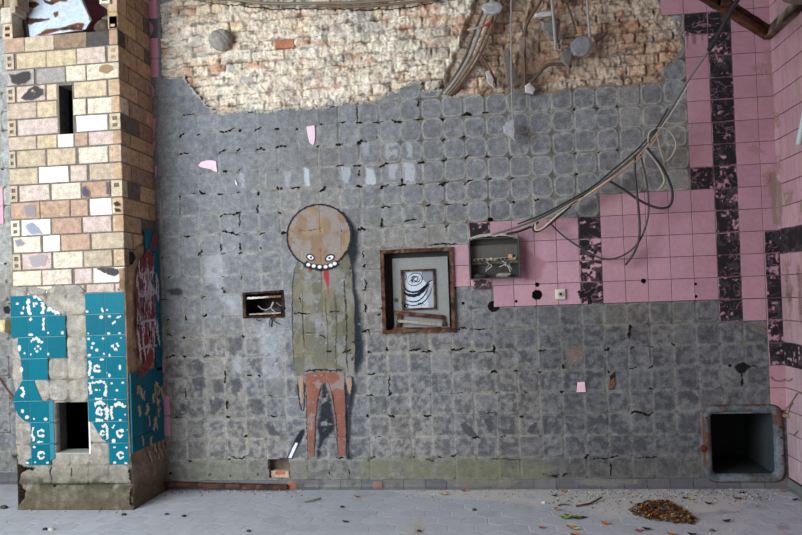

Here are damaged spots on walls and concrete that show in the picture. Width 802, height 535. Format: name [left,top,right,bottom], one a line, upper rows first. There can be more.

flaking render [160,0,685,116]
peeling [3,295,60,355]
peeling [12,409,49,464]
peeling [87,308,128,464]